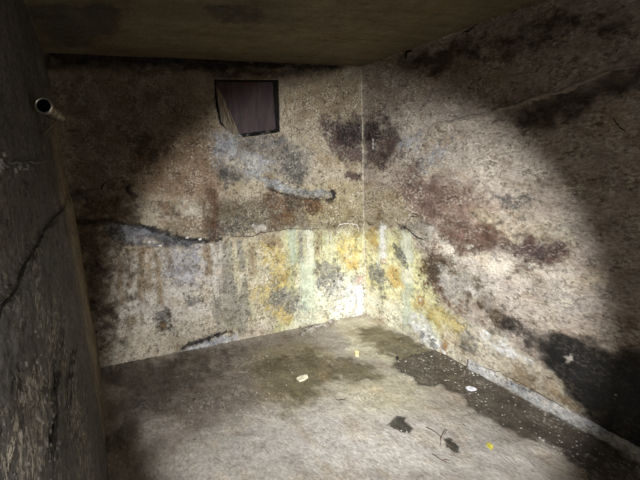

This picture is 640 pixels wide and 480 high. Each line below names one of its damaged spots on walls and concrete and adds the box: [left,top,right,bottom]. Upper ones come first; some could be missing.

crack [0,203,67,319]
water stain [397,131,577,264]
water stain [109,353,211,409]
water stain [210,209,640,480]